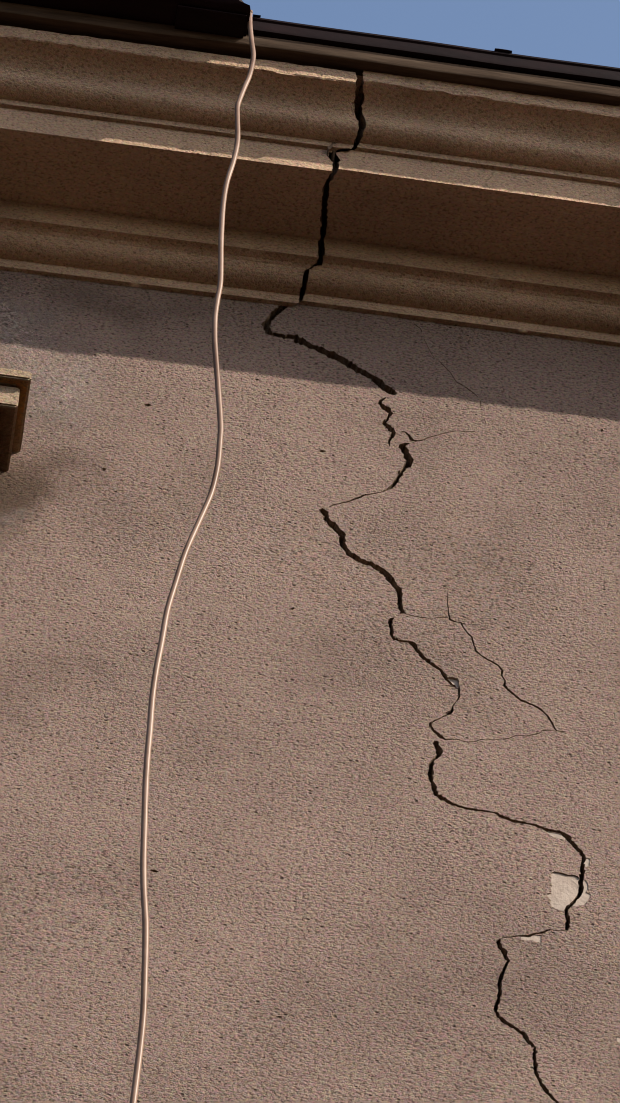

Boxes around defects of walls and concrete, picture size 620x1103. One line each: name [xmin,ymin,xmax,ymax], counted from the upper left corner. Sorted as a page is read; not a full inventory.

crack [261,71,586,1103]
peeling [547,858,591,911]